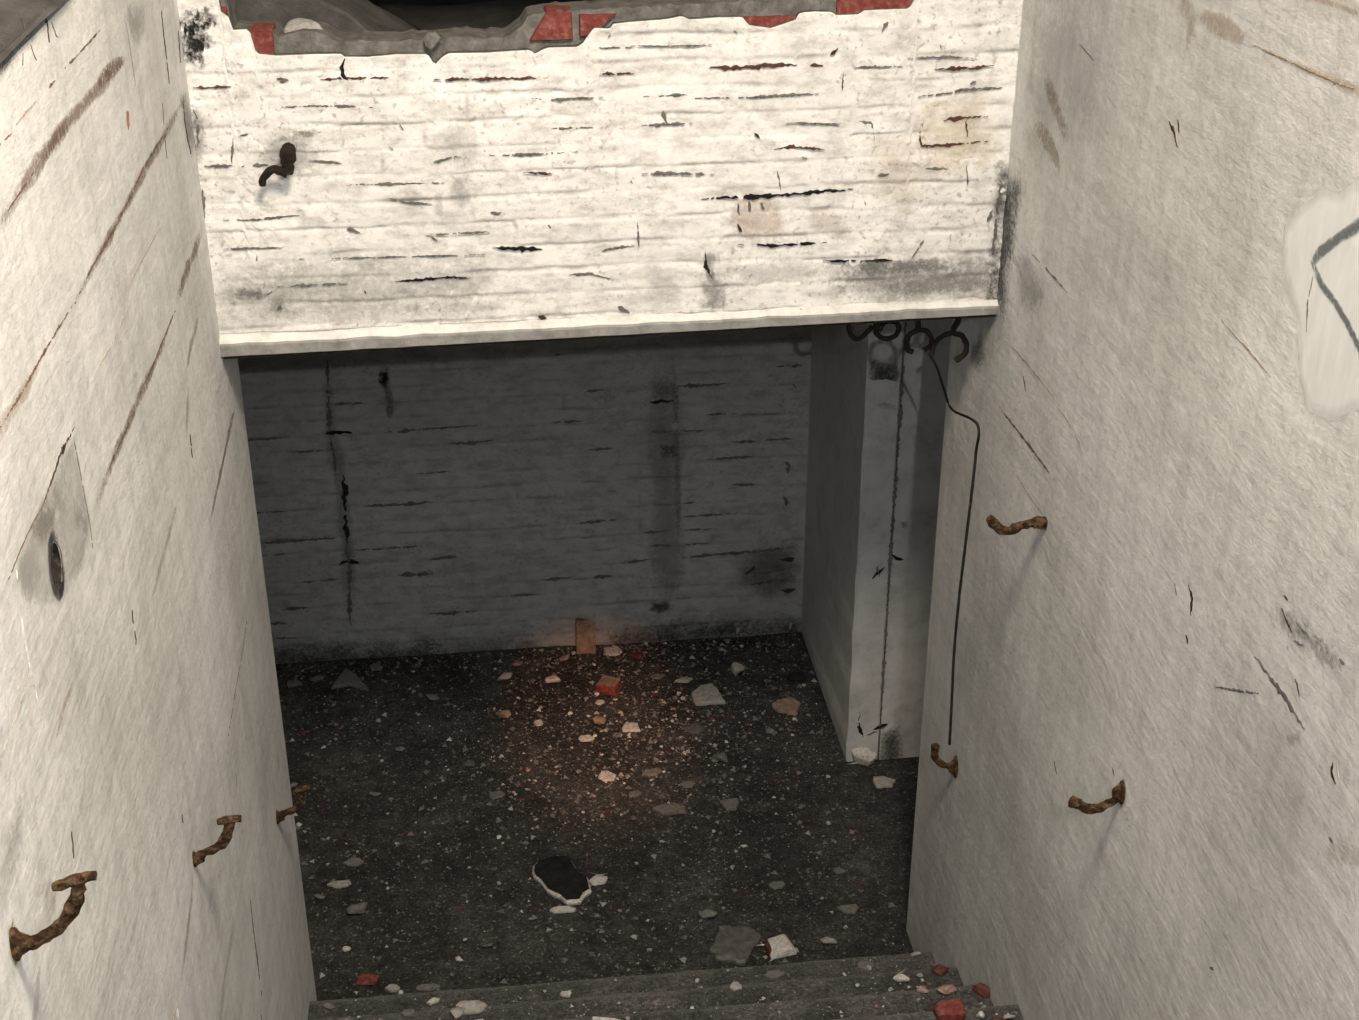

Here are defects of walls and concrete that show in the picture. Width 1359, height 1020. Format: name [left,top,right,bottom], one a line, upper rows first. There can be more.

corrosion [8,59,123,214]
corrosion [0,119,173,427]
spalling [8,427,93,580]
crack [325,360,359,625]